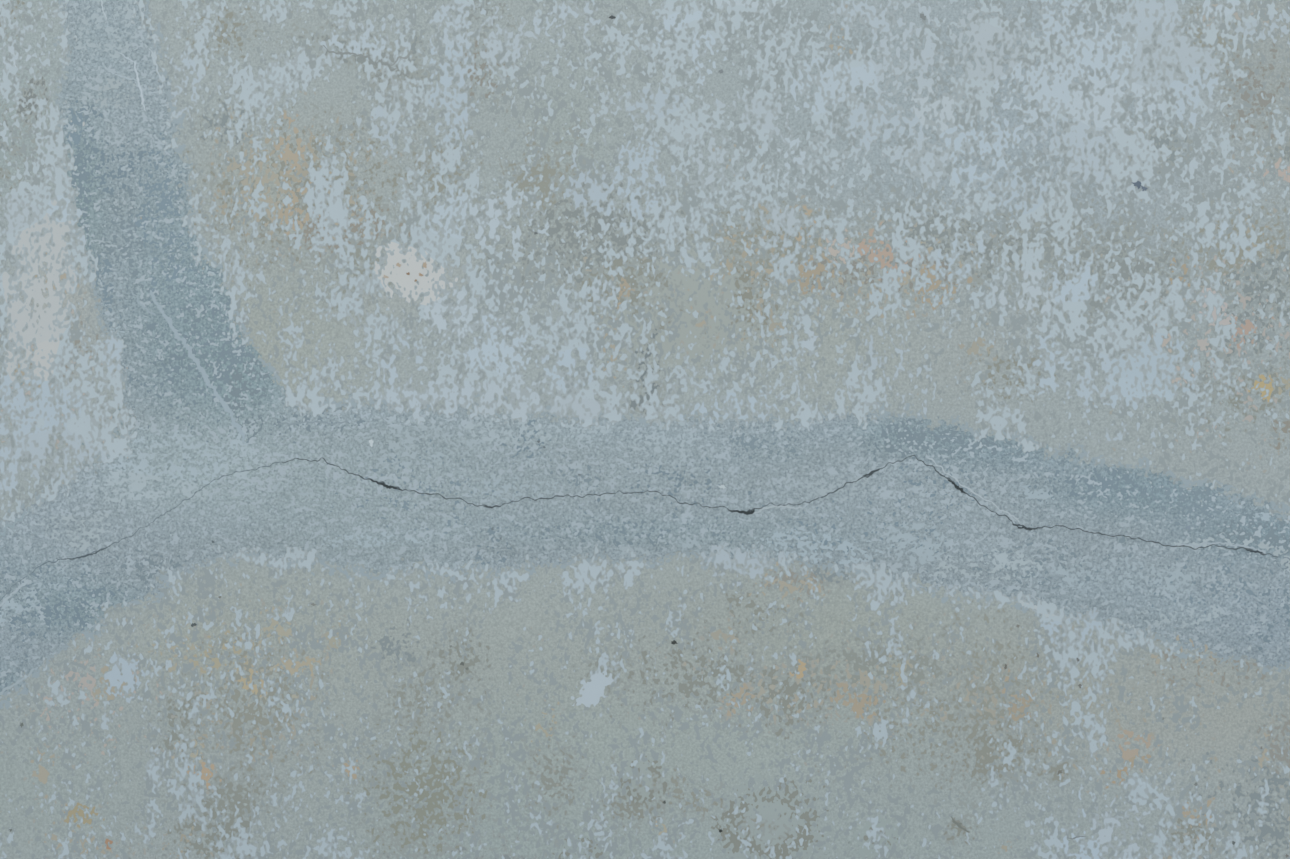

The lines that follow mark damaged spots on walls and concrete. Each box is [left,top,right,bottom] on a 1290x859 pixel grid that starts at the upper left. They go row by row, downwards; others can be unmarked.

crack [0,455,1290,607]